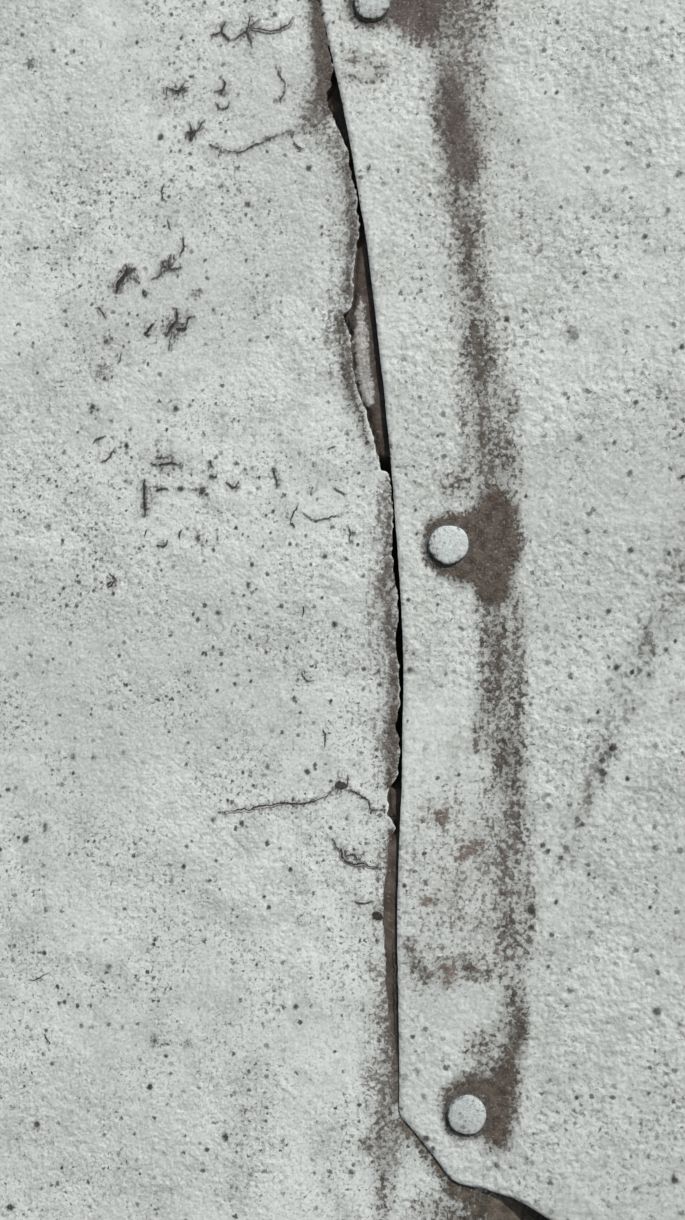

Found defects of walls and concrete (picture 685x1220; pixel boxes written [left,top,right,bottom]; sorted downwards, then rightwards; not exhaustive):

crack [162,0,304,157]
crack [136,454,241,549]
crack [271,466,356,540]
corrosion [341,0,536,1152]
crack [218,730,386,815]
crack [331,836,382,870]
crack [392,935,400,1069]